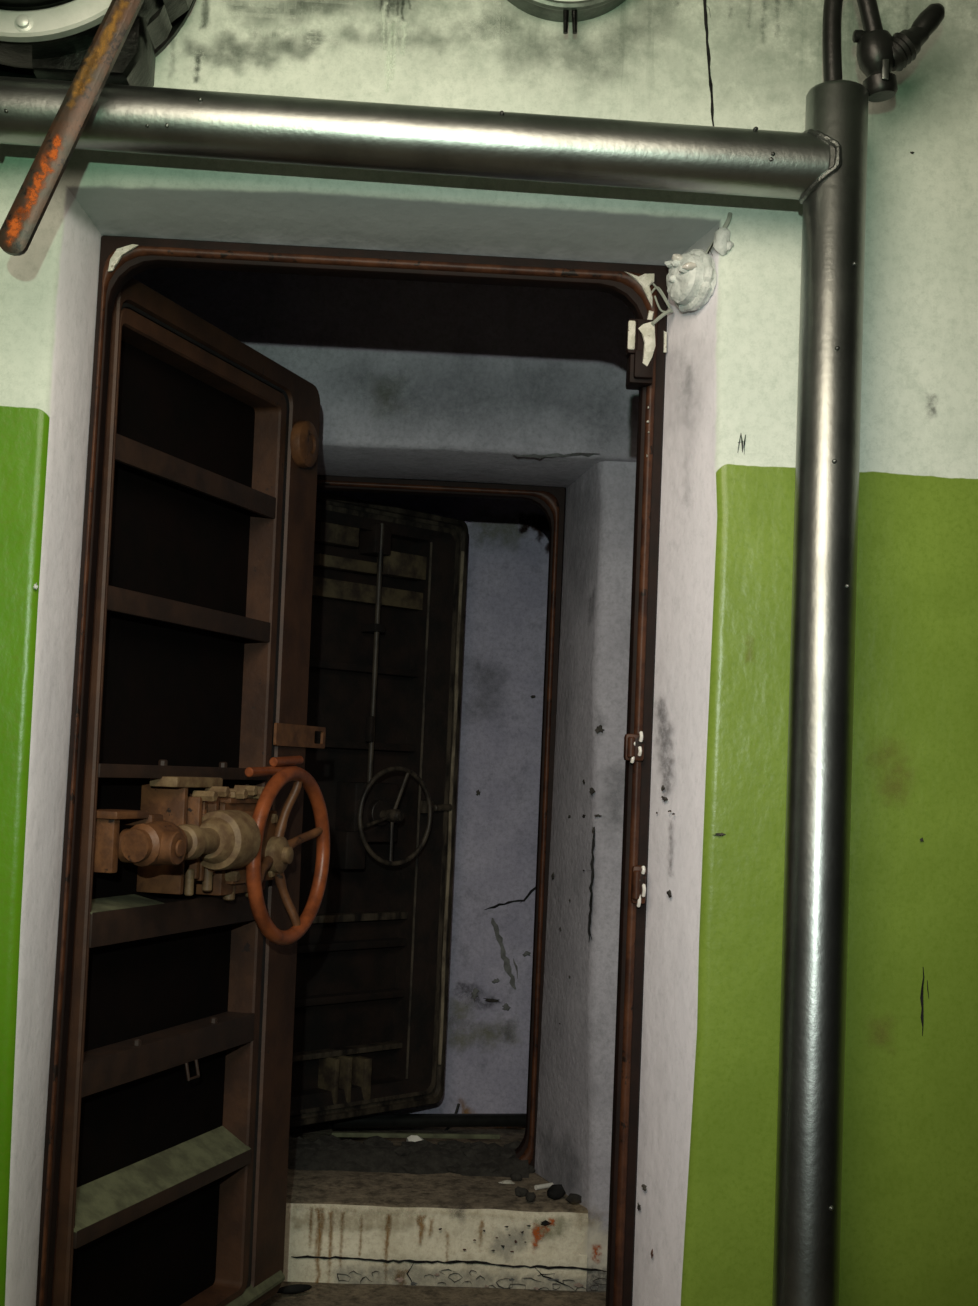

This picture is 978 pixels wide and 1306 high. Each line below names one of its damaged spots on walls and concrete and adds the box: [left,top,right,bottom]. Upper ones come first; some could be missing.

crack [703,0,714,126]
crack [485,886,536,910]
corrosion [310,1208,344,1283]